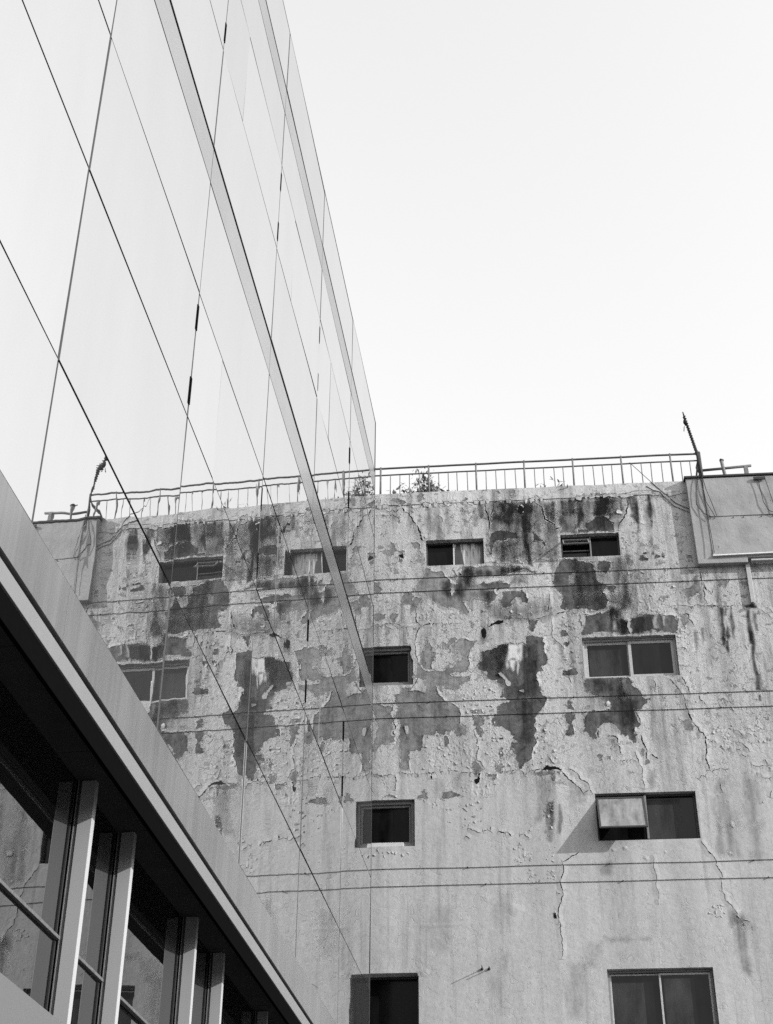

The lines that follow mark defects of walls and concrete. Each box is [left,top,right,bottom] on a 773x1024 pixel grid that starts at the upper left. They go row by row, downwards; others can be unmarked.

water stain [444,495,614,596]
water stain [627,495,653,522]
peeling [372,530,565,784]
water stain [506,644,536,693]
water stain [720,608,735,651]
water stain [746,605,761,700]
crack [650,675,773,805]
crack [553,849,582,959]
crack [697,839,751,926]